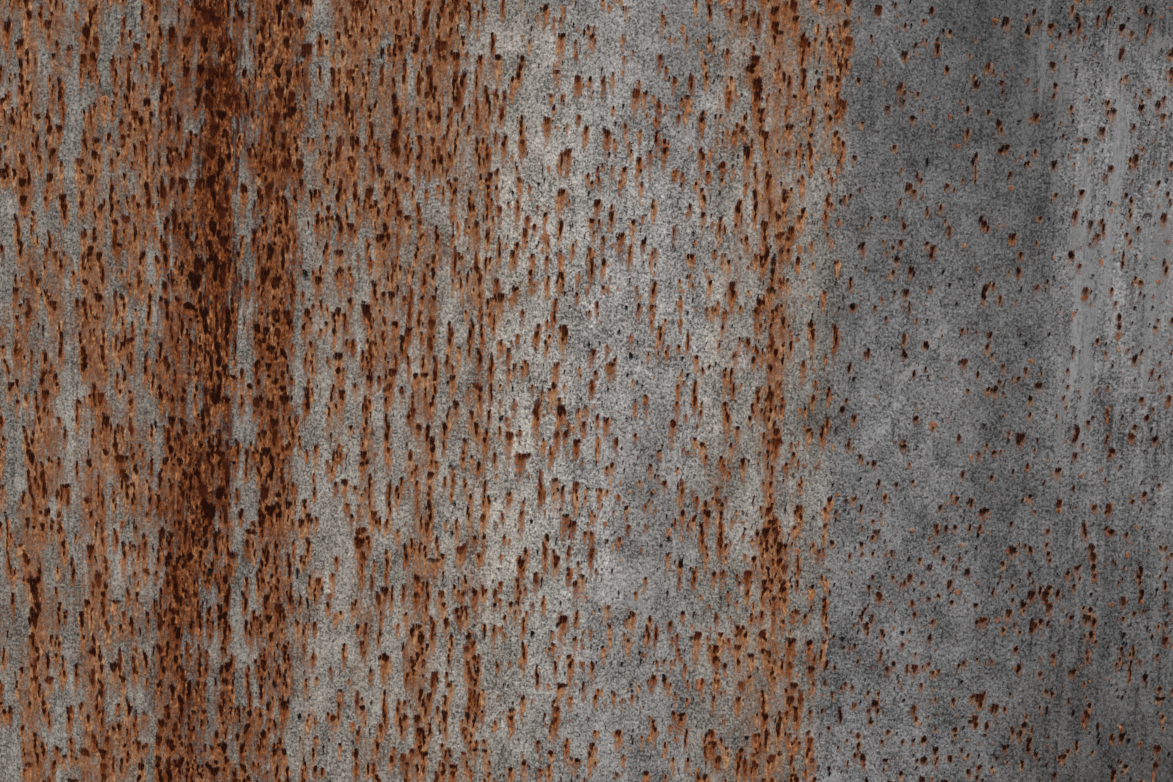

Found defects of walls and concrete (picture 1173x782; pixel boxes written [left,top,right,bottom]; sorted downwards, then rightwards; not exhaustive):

corrosion [874,217,929,322]
corrosion [899,156,951,257]
corrosion [931,114,978,191]
corrosion [955,47,1173,372]
corrosion [905,489,990,642]
corrosion [961,331,1173,729]